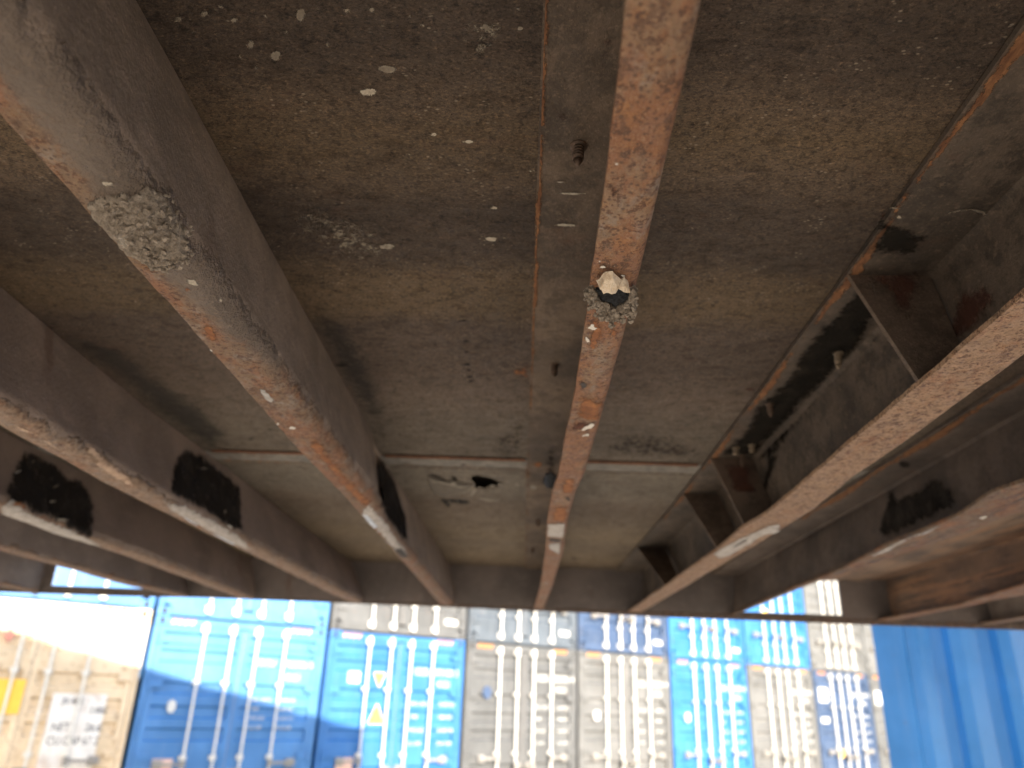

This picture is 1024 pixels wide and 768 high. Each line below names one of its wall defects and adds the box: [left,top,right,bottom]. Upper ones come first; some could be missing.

corrosion [916,31,1024,183]
corrosion [529,0,549,409]
corrosion [806,193,909,331]
peeling [428,478,499,507]
corrosion [586,349,795,519]